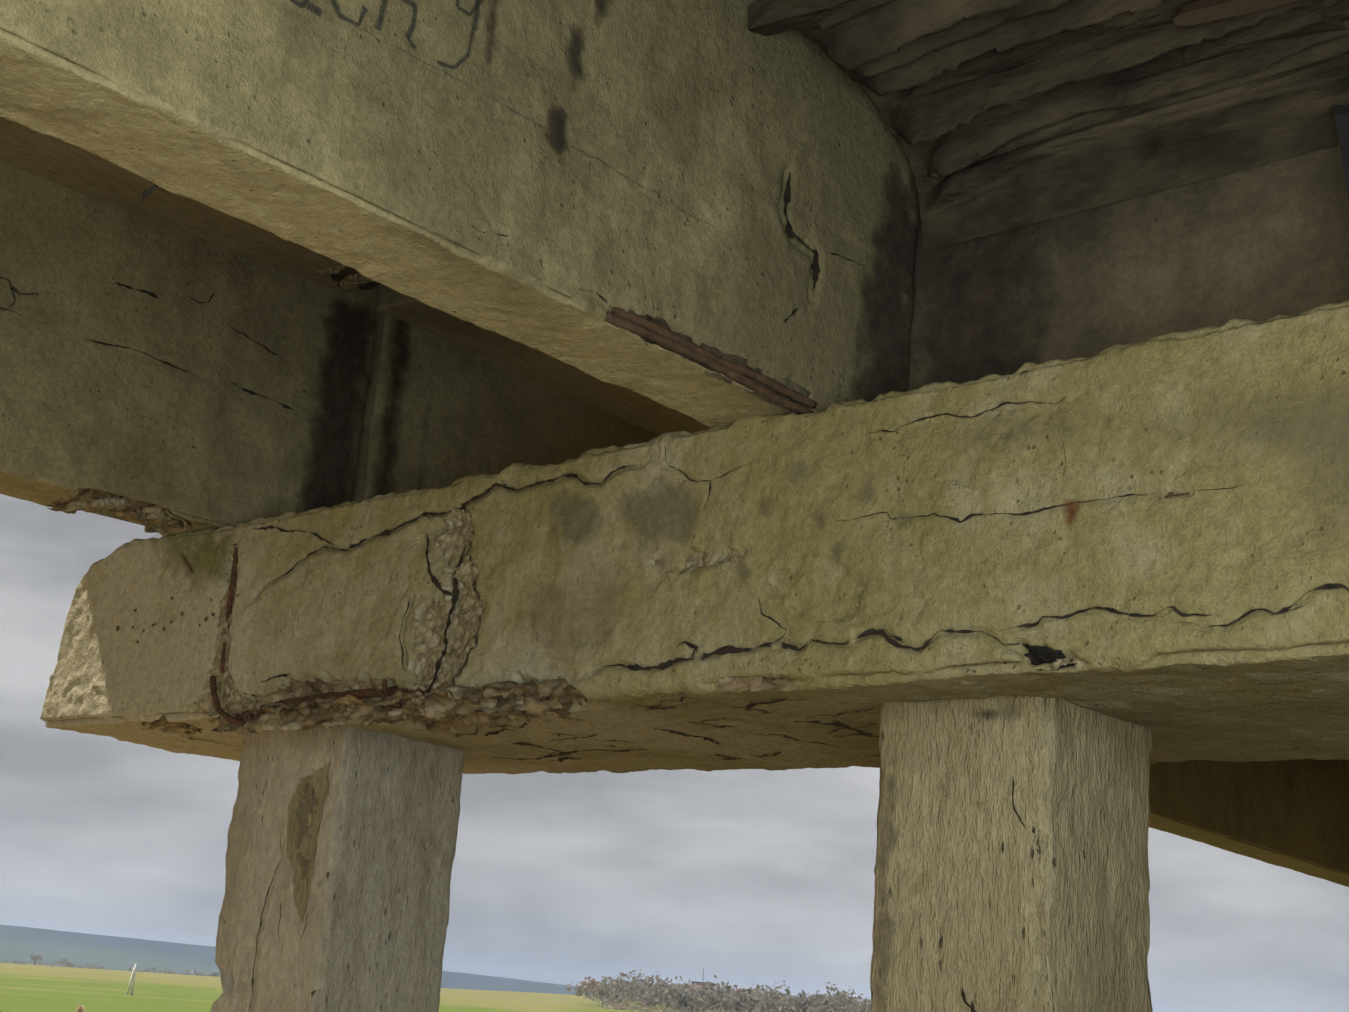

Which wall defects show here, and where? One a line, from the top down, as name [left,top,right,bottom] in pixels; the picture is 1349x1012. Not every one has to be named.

crack [784,172,865,323]
spalling [46,488,192,534]
leakage [304,303,374,511]
leakage [376,320,409,495]
crack [254,447,744,599]
crack [866,396,1067,436]
crack [838,441,1152,523]
crack [243,674,288,697]
spalling [141,506,589,738]
crack [455,583,1349,763]
spalling [1022,644,1086,671]
crack [249,825,308,1010]